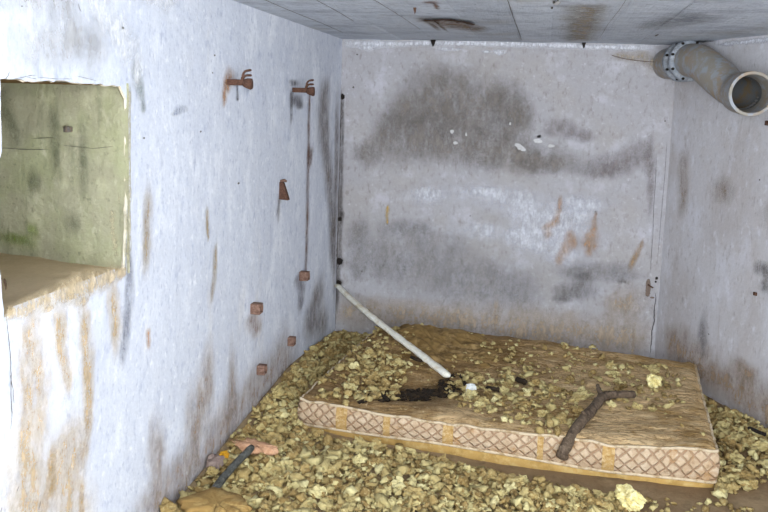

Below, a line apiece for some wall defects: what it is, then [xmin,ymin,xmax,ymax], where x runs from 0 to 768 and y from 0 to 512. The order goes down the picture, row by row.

damp [361,74,564,170]
crack [6,314,14,423]
damp [56,318,65,371]
damp [83,318,91,428]
damp [111,262,132,350]
damp [20,423,39,512]